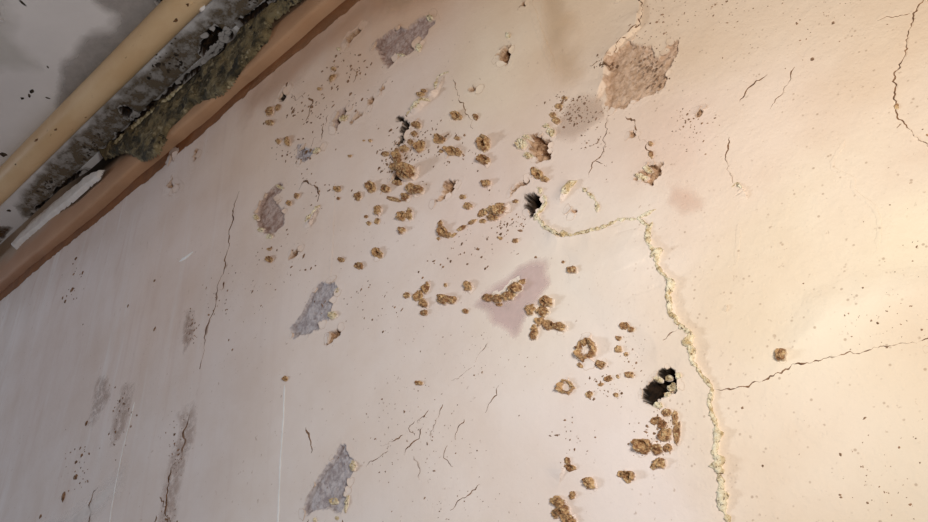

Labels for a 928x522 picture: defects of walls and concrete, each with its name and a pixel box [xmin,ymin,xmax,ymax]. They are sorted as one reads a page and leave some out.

damp [20,0,302,215]
peeling [250,178,291,242]
peeling [291,8,441,170]
peeling [451,123,619,257]
flaking render [570,0,685,118]
flaking render [630,157,670,190]
crack [878,0,928,152]
crack [199,192,239,369]
peeling [285,274,346,353]
spalling [635,360,686,411]
crack [560,209,928,522]
peeling [298,436,362,522]